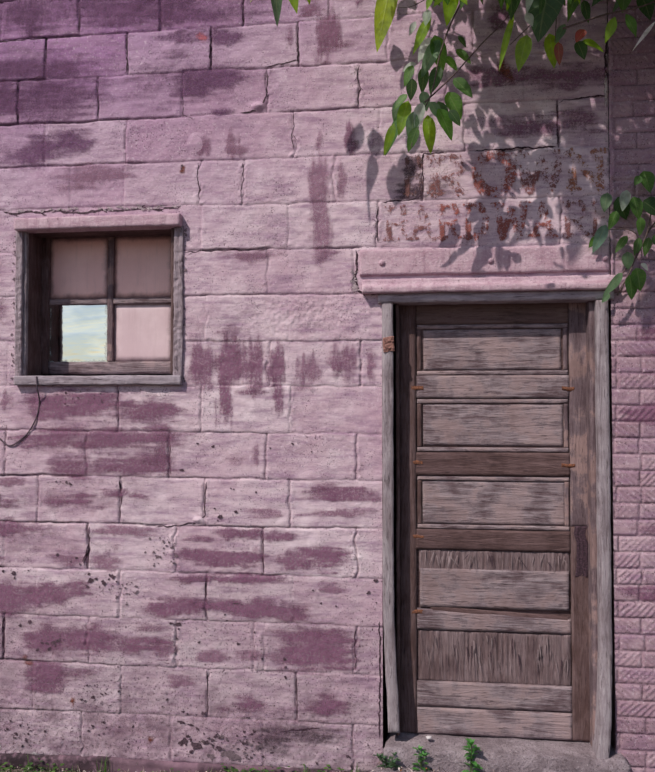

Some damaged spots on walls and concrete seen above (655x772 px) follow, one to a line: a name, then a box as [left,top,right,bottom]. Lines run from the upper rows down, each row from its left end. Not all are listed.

water stain [301,1,349,63]
water stain [5,128,94,167]
crack [4,165,200,217]
water stain [308,162,337,263]
crack [373,152,447,241]
crack [352,251,375,296]
water stain [189,331,285,415]
water stain [330,347,356,378]
water stain [622,404,655,425]
water stain [177,528,349,593]
water stain [0,581,91,616]
water stain [23,597,356,693]